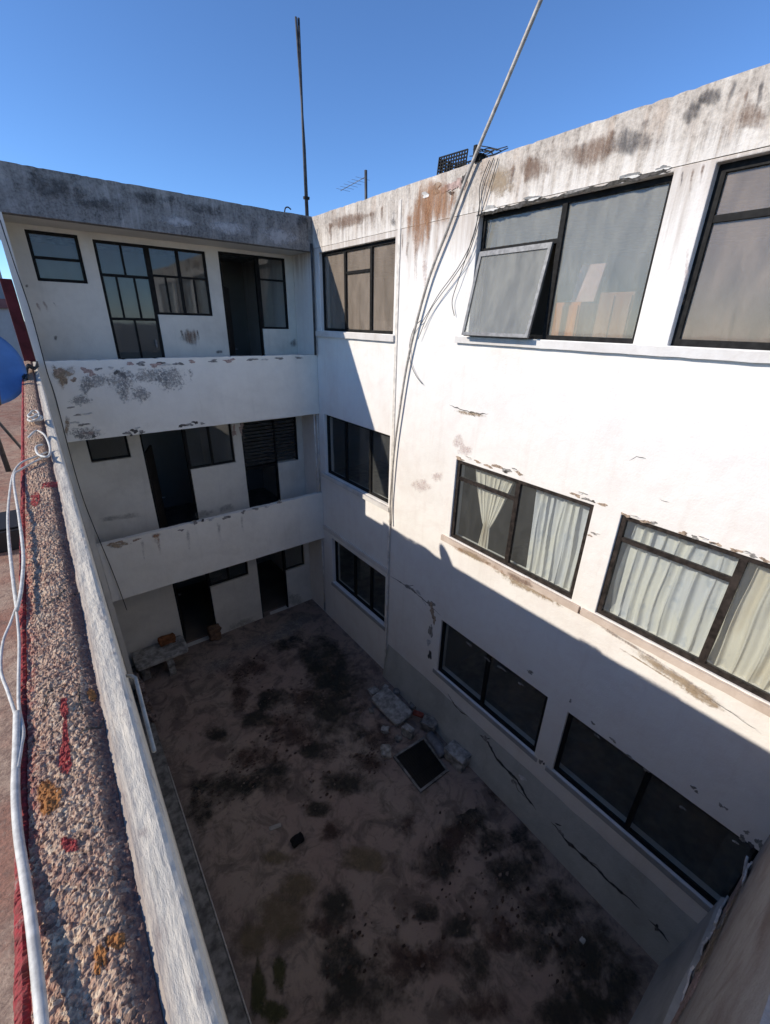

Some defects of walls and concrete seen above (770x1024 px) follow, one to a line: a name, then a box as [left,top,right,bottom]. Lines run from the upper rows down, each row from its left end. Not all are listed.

leakage [684,89,716,120]
leakage [730,83,762,125]
leakage [575,130,638,167]
leakage [488,157,547,196]
leakage [168,205,241,234]
rust [407,181,453,248]
peeling [53,360,195,386]
peeling [65,395,100,439]
peeling [456,456,523,476]
crack [392,577,440,615]
crack [480,735,668,941]